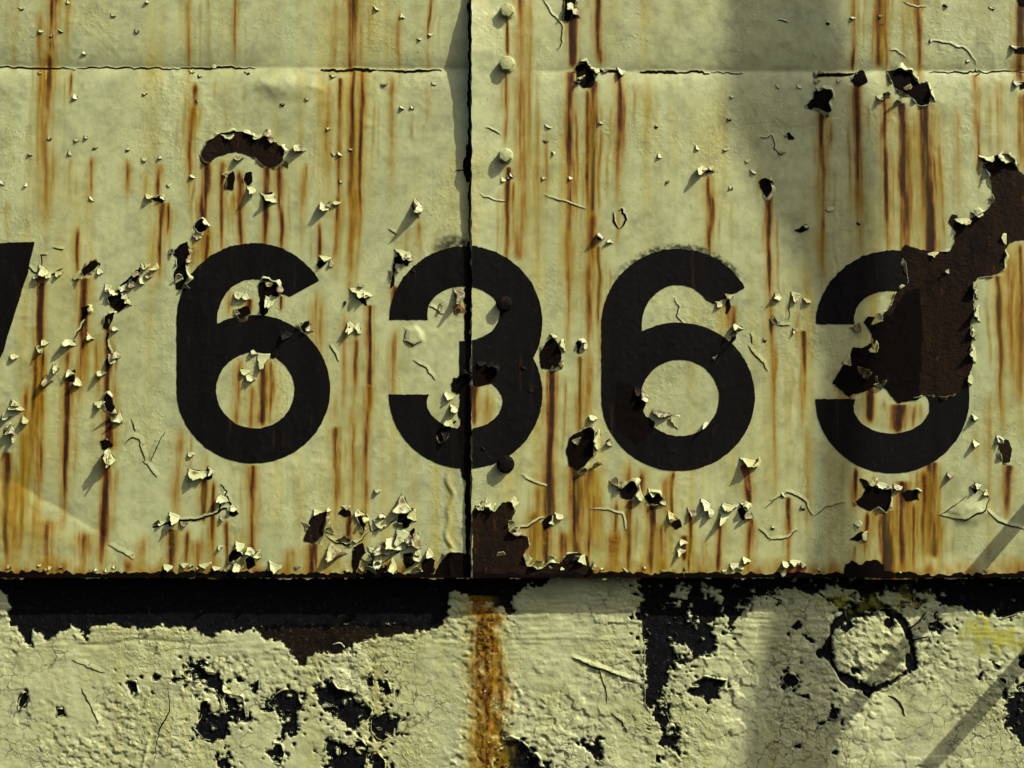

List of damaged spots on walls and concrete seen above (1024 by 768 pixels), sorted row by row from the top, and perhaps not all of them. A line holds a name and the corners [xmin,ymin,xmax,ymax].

rust [317,0,366,274]
rust [565,0,611,348]
rust [880,98,944,252]
peeling [832,151,1024,403]
rust [0,197,1024,579]
peeling [115,656,409,768]
peeling [0,491,604,667]
crack [759,489,846,541]
peeling [609,457,1024,764]
crack [815,589,832,605]
crack [888,693,907,716]
crack [905,608,935,643]